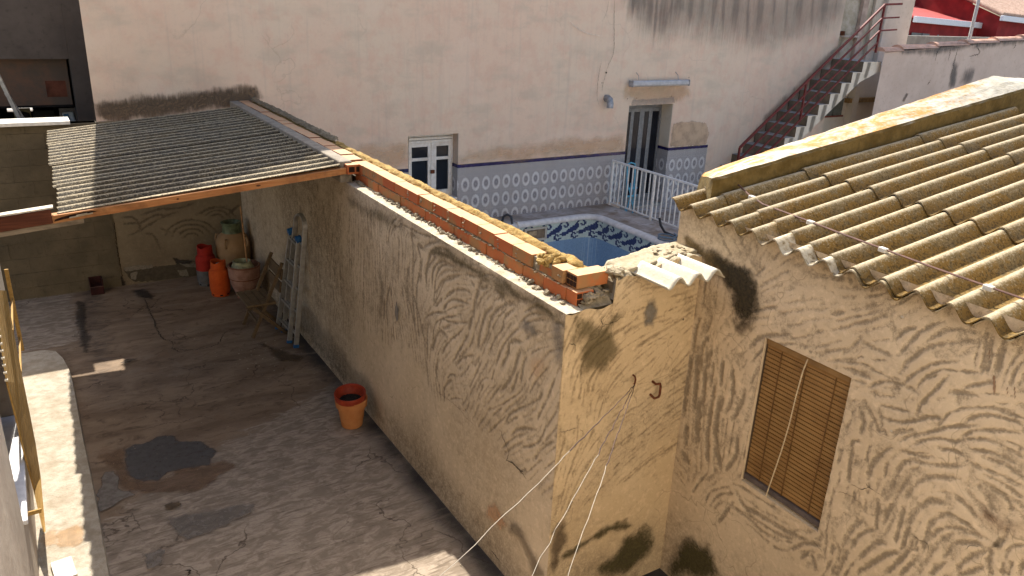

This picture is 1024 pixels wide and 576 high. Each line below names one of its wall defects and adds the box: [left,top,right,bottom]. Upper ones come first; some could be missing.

mould [96,86,259,121]
mould [714,256,758,319]
damp [580,322,616,369]